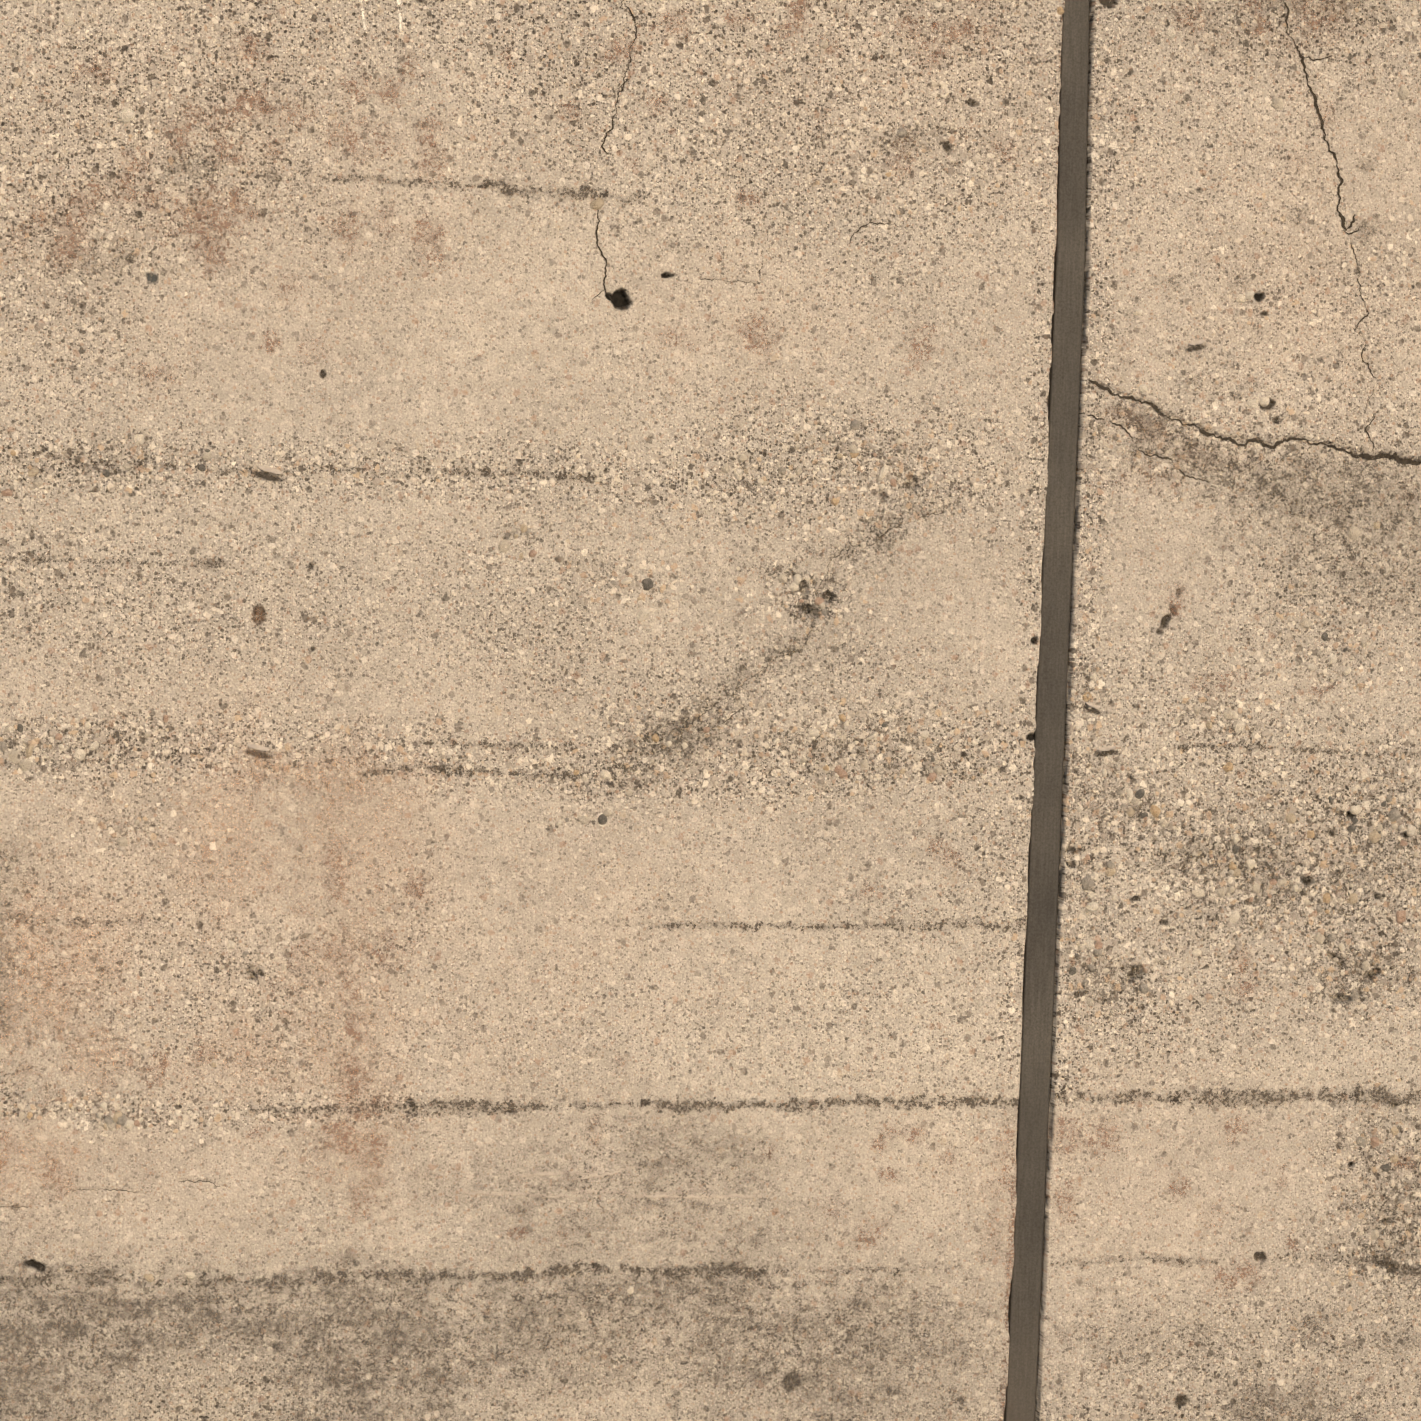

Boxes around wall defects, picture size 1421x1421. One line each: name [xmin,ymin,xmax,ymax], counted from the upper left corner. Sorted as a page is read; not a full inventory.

crack [601,0,637,154]
crack [591,210,612,303]
crack [1087,1,1421,483]